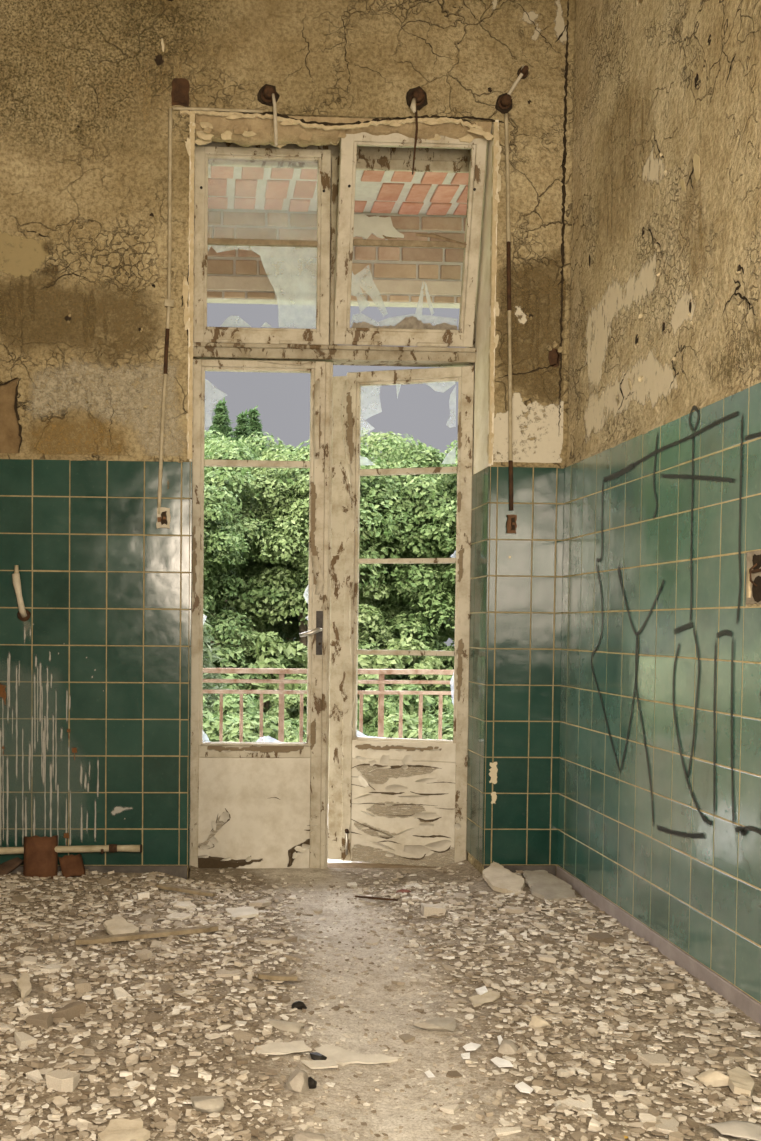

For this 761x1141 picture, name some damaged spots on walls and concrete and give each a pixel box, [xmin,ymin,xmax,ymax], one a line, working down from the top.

crack [396,21,455,68]
crack [497,0,569,425]
leakage [0,275,156,361]
flaking render [0,113,564,464]
peeling [582,227,698,443]
crack [713,267,756,316]
leakage [0,651,99,846]
peeling [198,808,262,868]
peeling [287,825,315,867]
peeling [351,744,461,867]